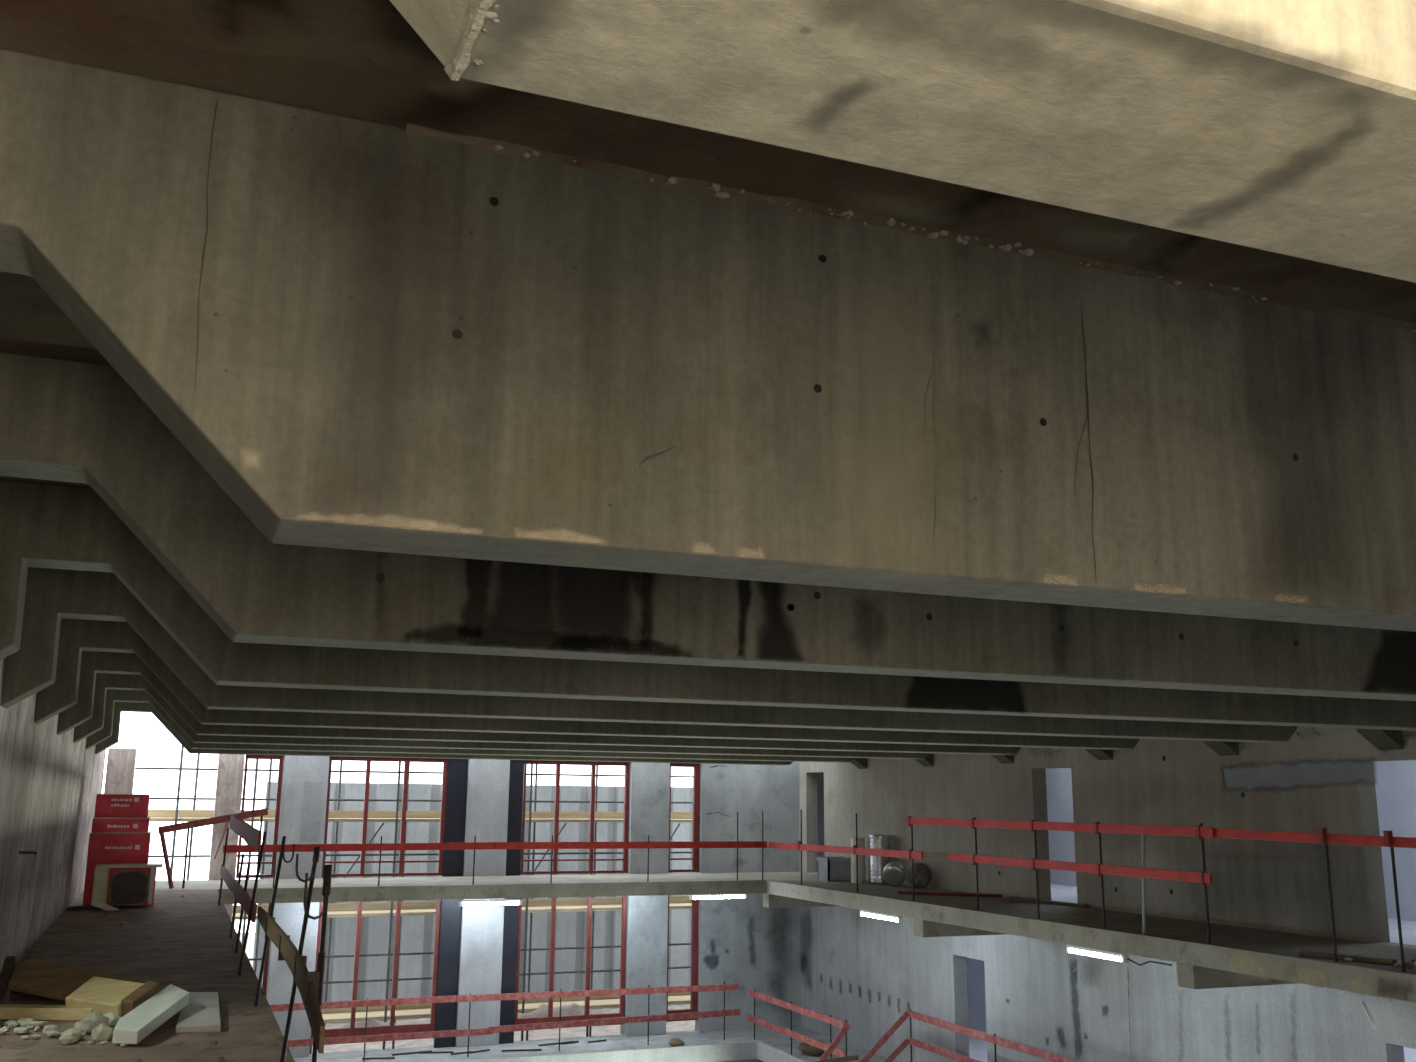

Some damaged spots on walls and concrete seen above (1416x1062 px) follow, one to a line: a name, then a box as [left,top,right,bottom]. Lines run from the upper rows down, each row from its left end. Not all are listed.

leakage [406,558,691,657]
leakage [738,580,800,660]
leakage [1364,631,1416,693]
leakage [906,676,1025,713]
leakage [705,941,728,969]